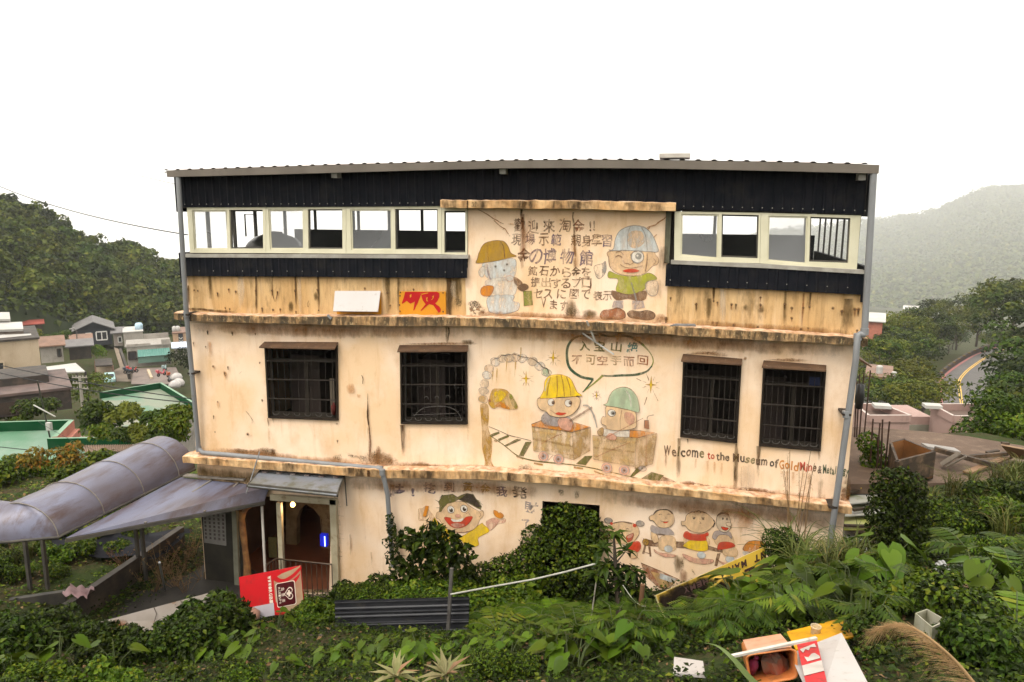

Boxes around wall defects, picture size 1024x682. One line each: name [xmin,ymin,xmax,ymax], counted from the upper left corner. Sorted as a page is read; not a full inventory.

damp [695,288,737,325]
damp [841,299,859,322]
crack [361,375,370,477]
damp [361,449,392,465]